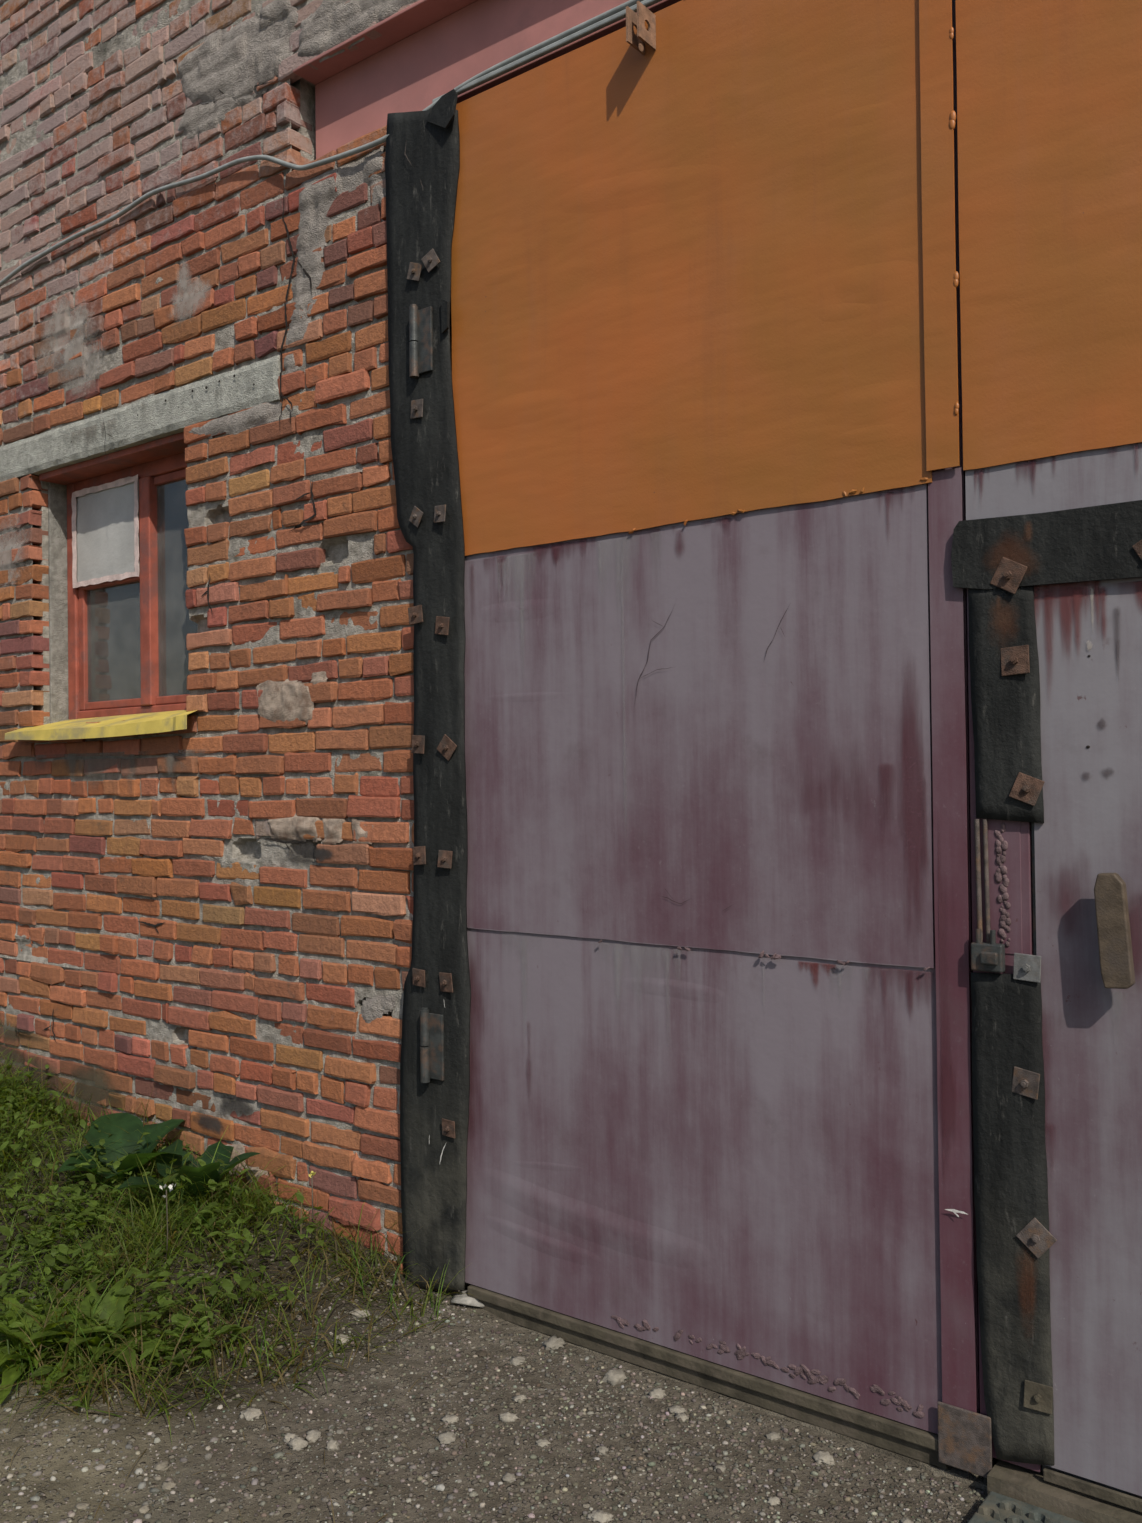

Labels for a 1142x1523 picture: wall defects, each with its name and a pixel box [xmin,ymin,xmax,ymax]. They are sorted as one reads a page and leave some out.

spalling [256,671,328,725]